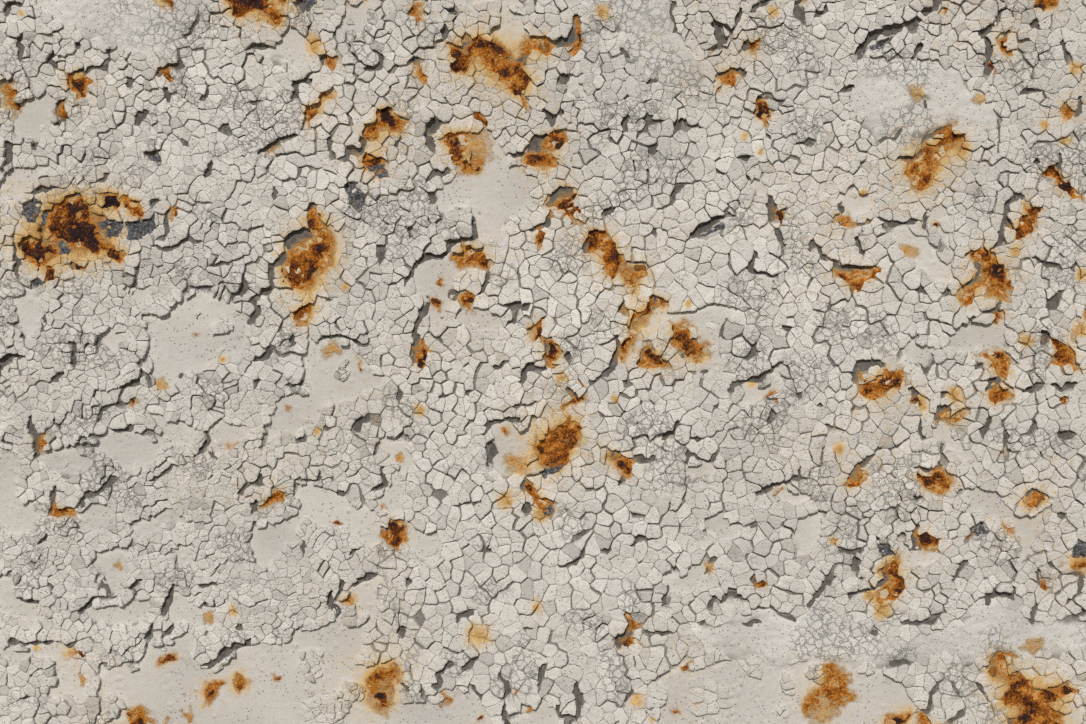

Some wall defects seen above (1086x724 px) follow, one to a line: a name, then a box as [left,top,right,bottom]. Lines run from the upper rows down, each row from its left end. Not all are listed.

rust [448,16,584,118]
crack [1017,0,1086,195]
rust [20,193,144,282]
crack [797,111,1086,450]
crack [0,195,282,724]
rust [504,381,586,518]
peeling [0,575,492,724]
crack [355,541,617,724]
peeling [510,700,558,724]
peeling [616,648,959,724]
crack [914,645,1086,724]
rust [988,638,1079,724]